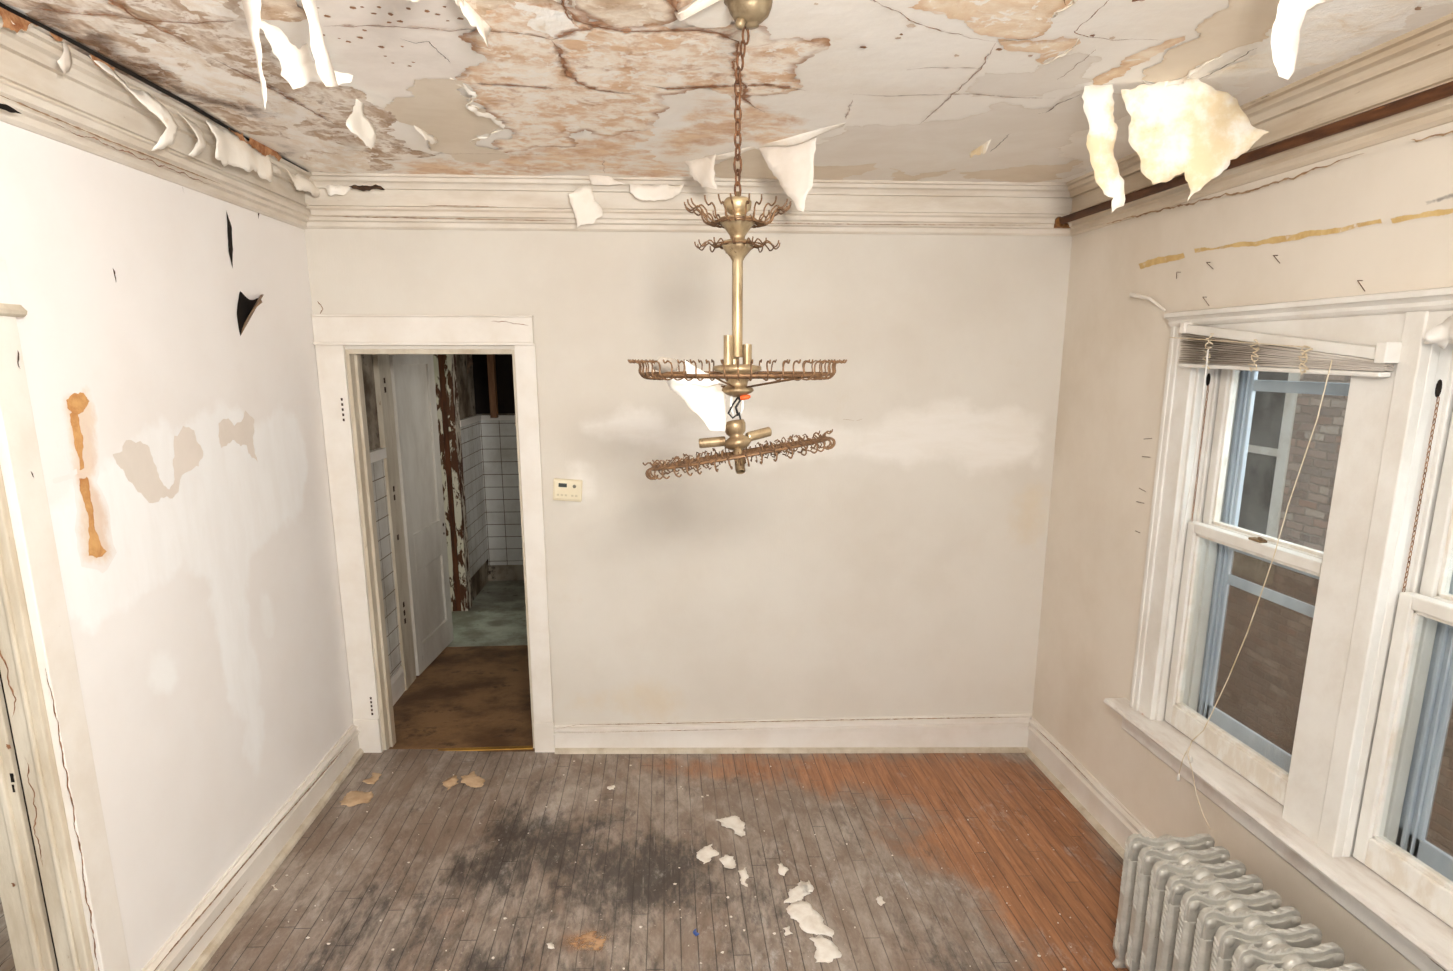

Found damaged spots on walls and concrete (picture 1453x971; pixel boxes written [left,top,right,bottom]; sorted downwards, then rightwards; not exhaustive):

peeling [0,7,63,41]
crack [54,123,206,184]
peeling [180,0,239,18]
crack [37,0,447,154]
peeling [112,27,378,173]
leakage [0,0,831,178]
peeling [260,0,693,164]
crack [344,0,807,112]
peeling [714,148,777,179]
crack [845,0,1154,121]
peeling [813,0,1453,183]
peeling [113,426,203,503]